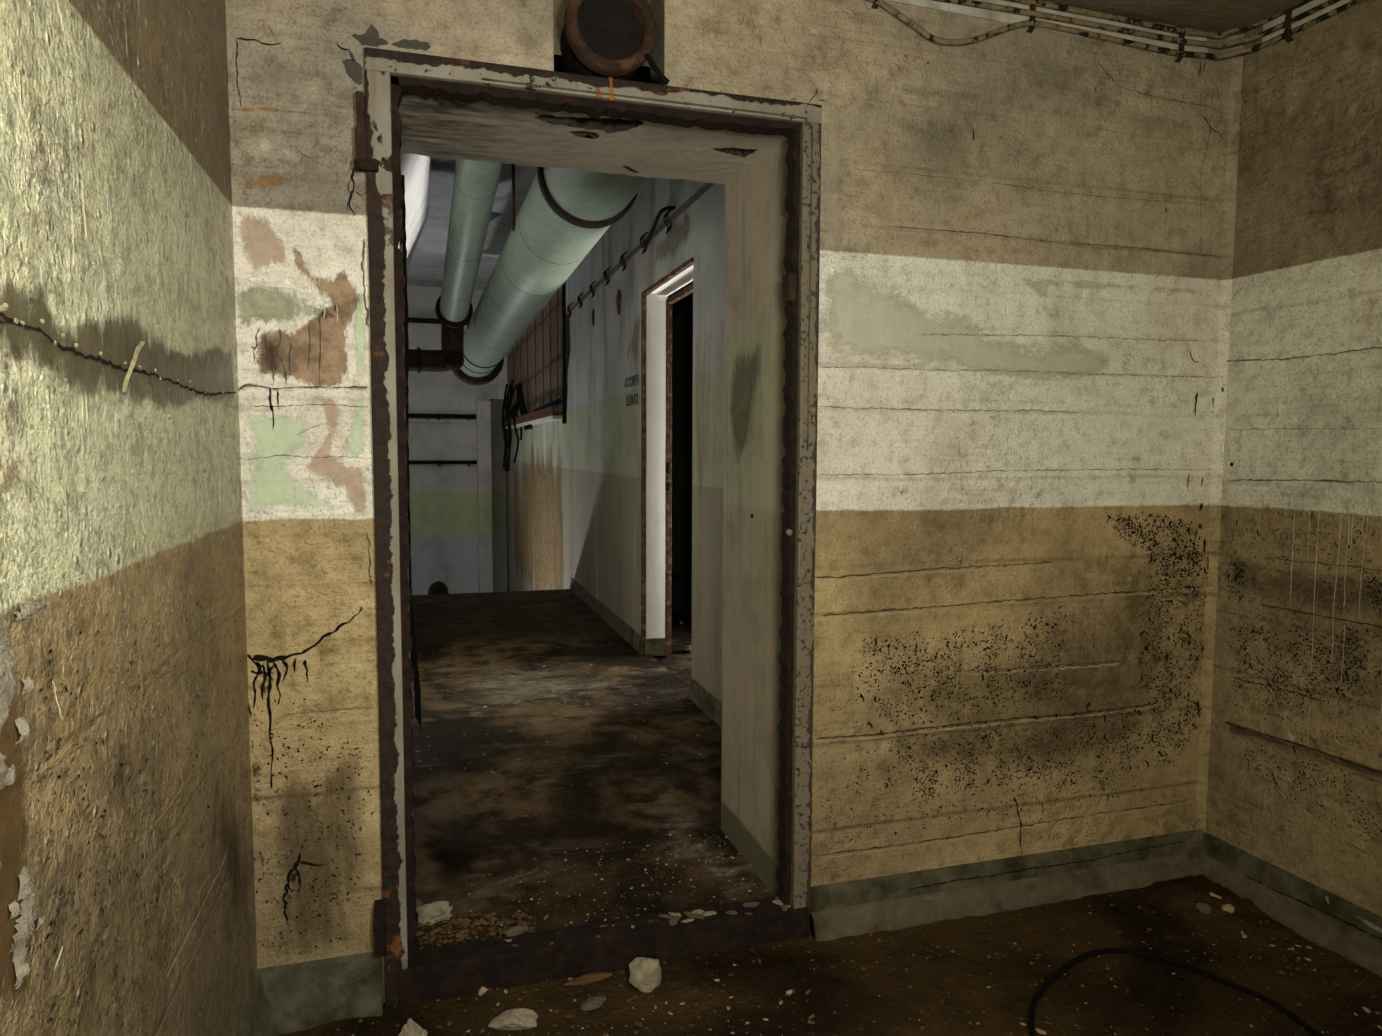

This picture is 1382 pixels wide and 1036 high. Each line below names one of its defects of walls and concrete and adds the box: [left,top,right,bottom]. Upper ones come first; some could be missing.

water stain [0,265,338,428]
crack [0,312,368,460]
peeling [242,217,369,512]
crack [247,606,371,789]
water stain [820,503,1209,843]
water stain [1227,507,1382,842]
crack [283,853,326,922]